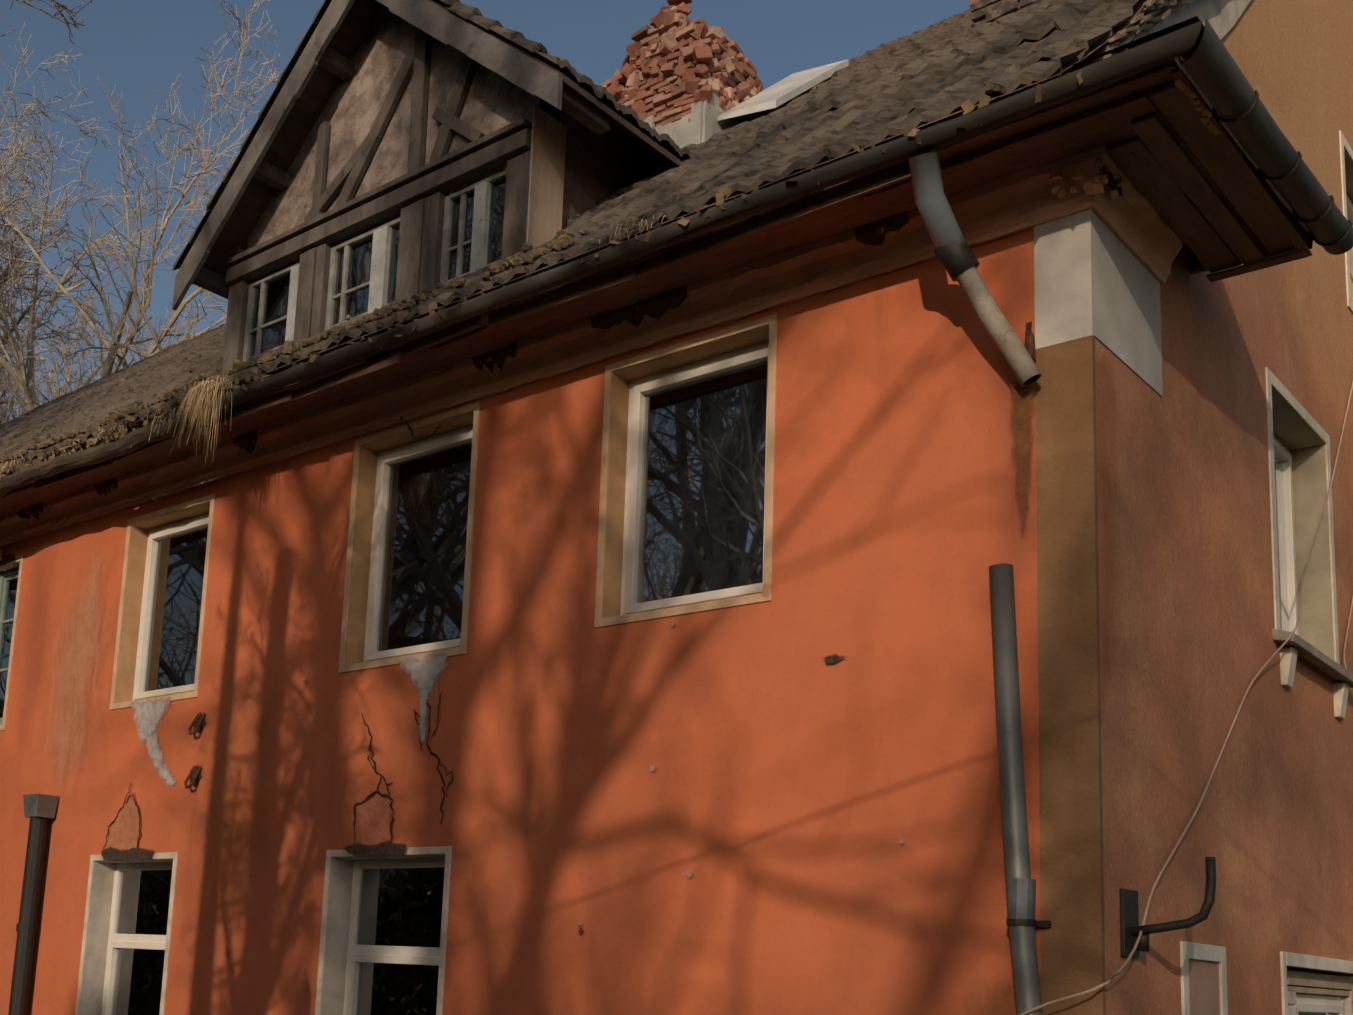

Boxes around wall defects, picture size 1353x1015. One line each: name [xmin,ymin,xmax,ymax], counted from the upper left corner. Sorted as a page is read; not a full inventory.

crack [361,713,392,795]
crack [413,692,453,824]
flaking render [101,783,154,862]